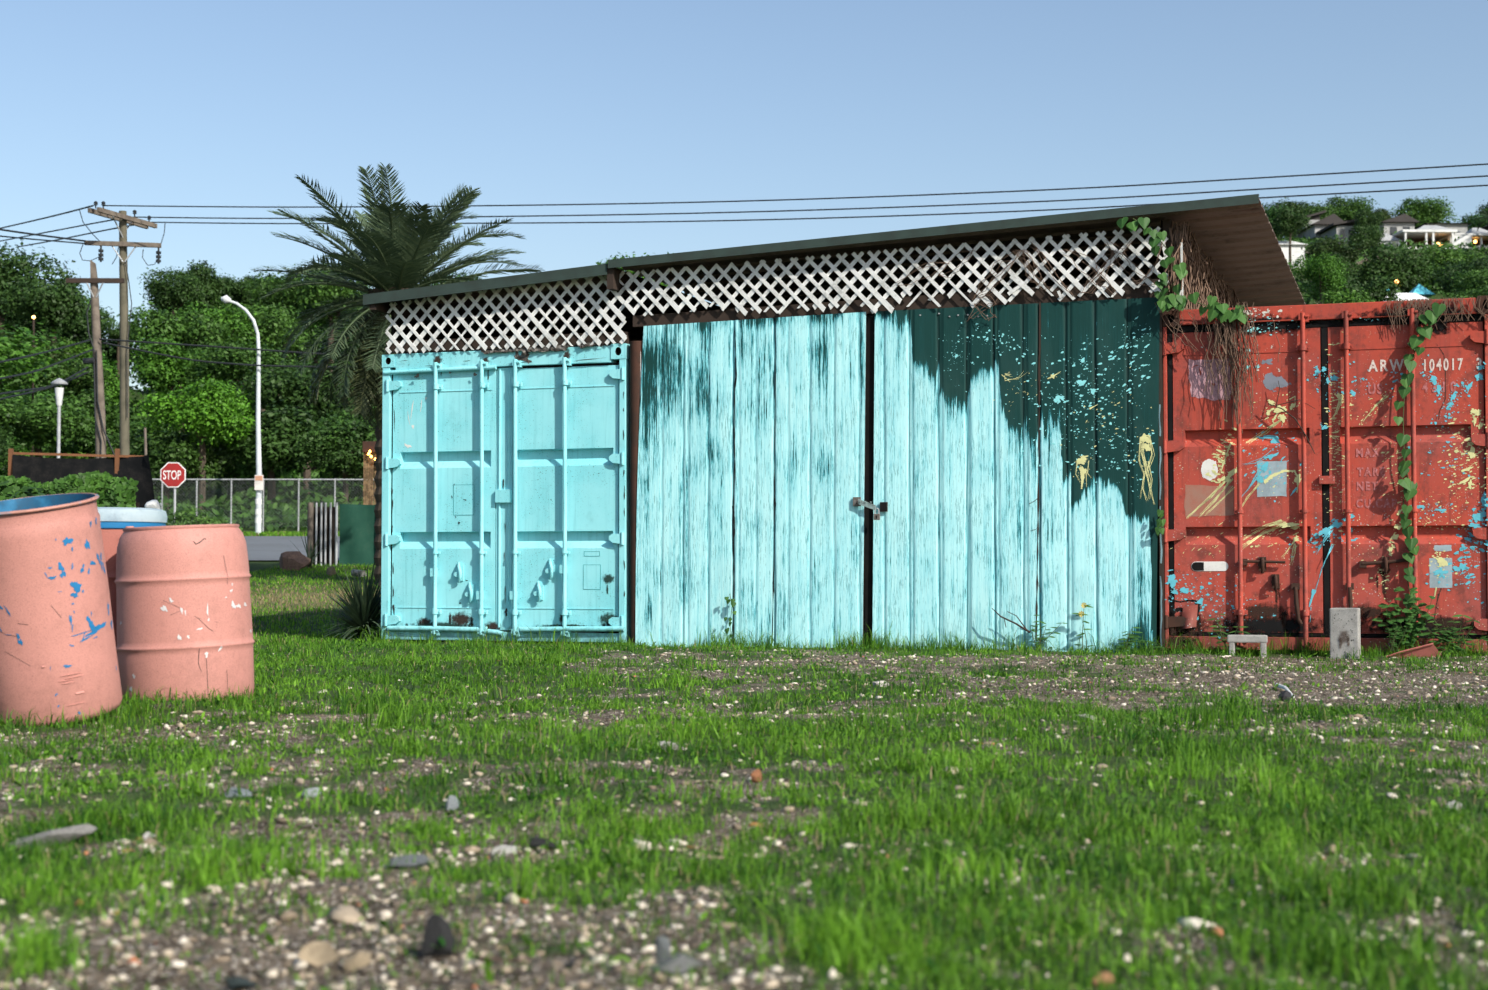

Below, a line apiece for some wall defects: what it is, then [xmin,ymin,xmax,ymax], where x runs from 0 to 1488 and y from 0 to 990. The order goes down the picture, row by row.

rust [449,612,500,630]
rust [1165,614,1209,649]
rust [1233,584,1292,627]
rust [1354,567,1390,626]
rust [1428,618,1472,632]